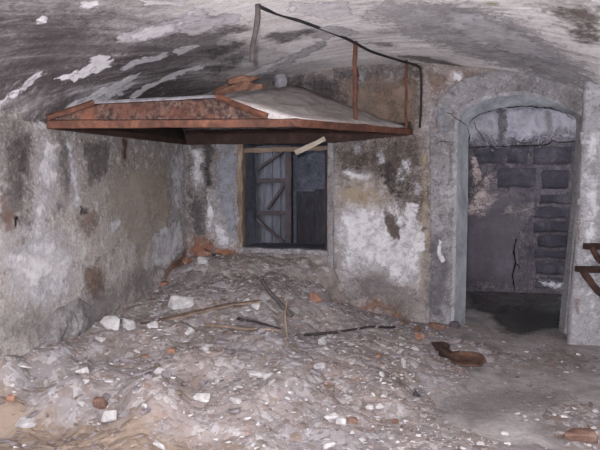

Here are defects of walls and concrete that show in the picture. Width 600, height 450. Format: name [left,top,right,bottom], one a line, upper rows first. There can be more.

peeling [0,71,43,104]
peeling [53,55,115,83]
peeling [80,0,99,9]
peeling [66,43,205,108]
peeling [115,0,241,44]
leakage [267,29,317,43]
leakage [362,0,600,89]
leakage [0,136,80,339]
leakage [84,141,238,321]
flaking render [164,237,238,279]
leakage [334,181,430,311]
crack [512,238,520,291]